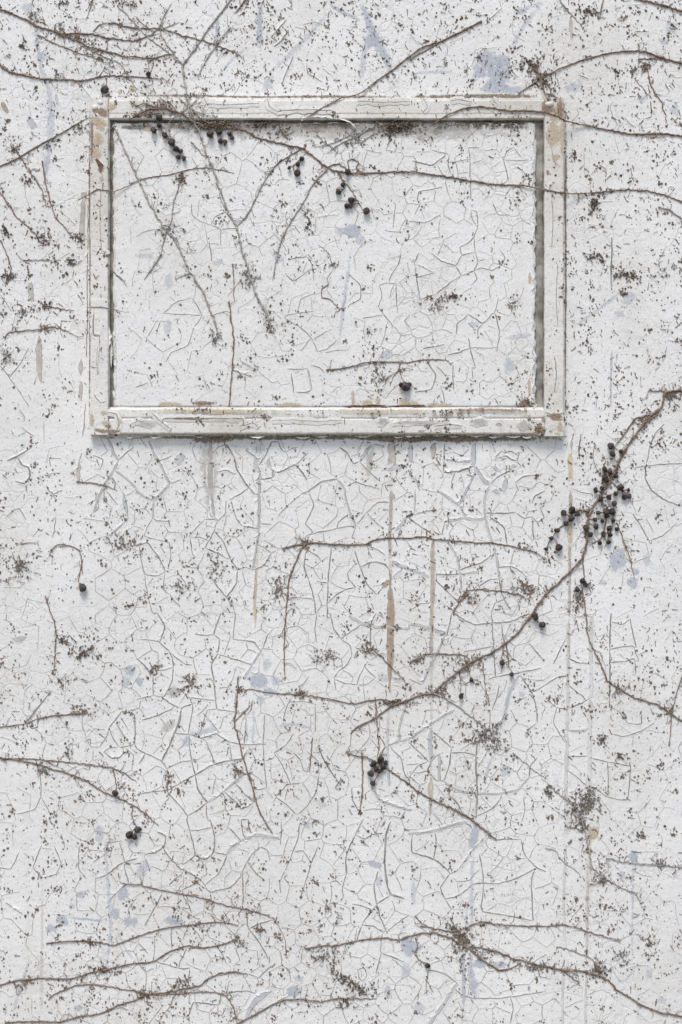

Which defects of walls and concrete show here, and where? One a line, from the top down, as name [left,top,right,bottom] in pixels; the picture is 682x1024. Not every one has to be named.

crack [56,0,161,81]
crack [231,19,334,99]
crack [435,19,497,105]
crack [619,3,682,55]
crack [581,76,682,289]
crack [0,157,110,374]
crack [128,128,531,403]
crack [547,189,561,326]
crack [0,347,682,1024]